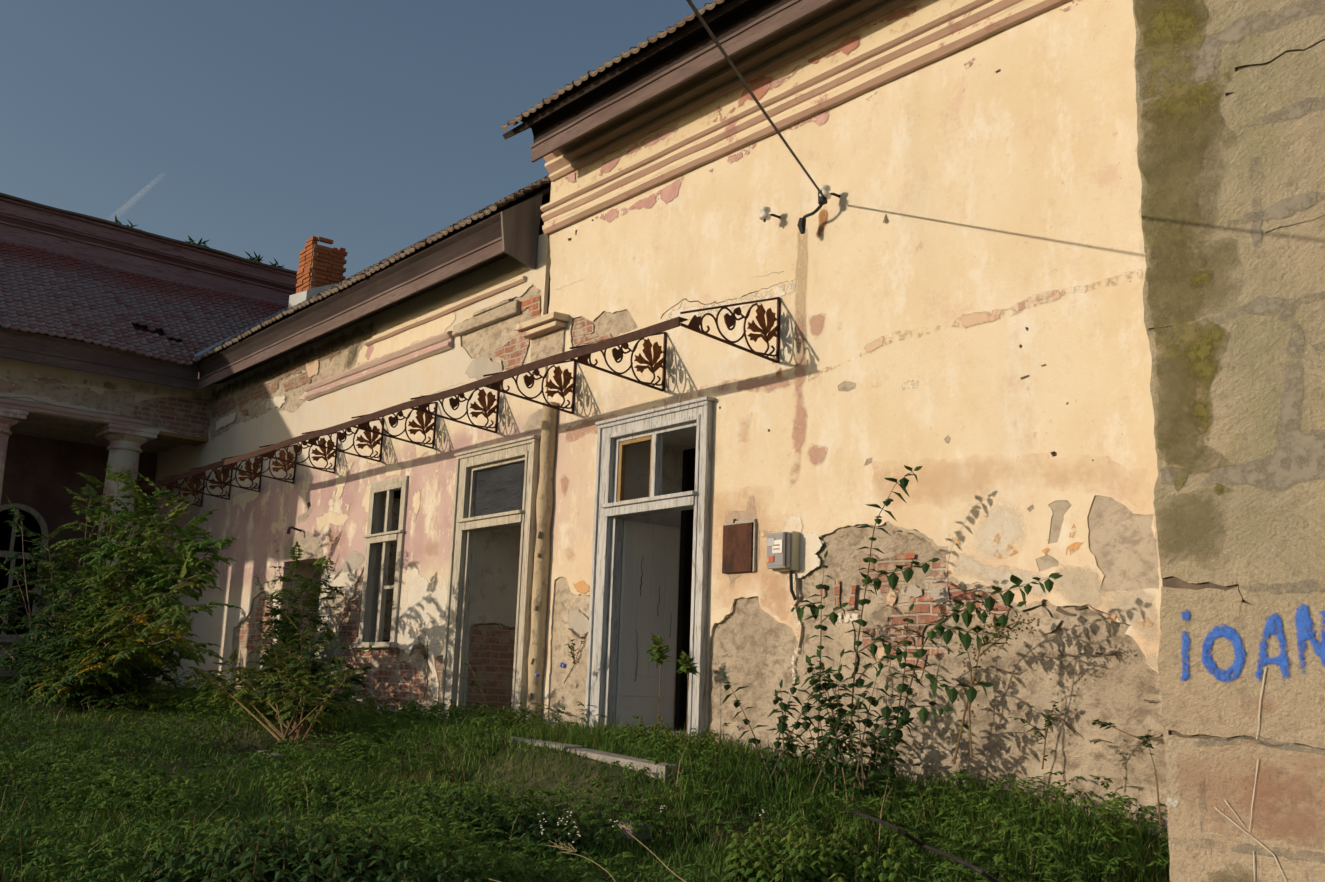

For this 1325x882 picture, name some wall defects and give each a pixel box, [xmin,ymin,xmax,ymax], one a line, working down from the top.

peeling [873,6,917,25]
peeling [713,35,860,122]
peeling [599,125,678,176]
peeling [595,176,684,223]
spalling [210,285,542,441]
spalling [572,310,638,349]
spalling [233,592,273,691]
spalling [324,565,448,716]
flaking render [466,625,515,720]
spalling [534,577,590,732]
spalling [707,495,1169,842]